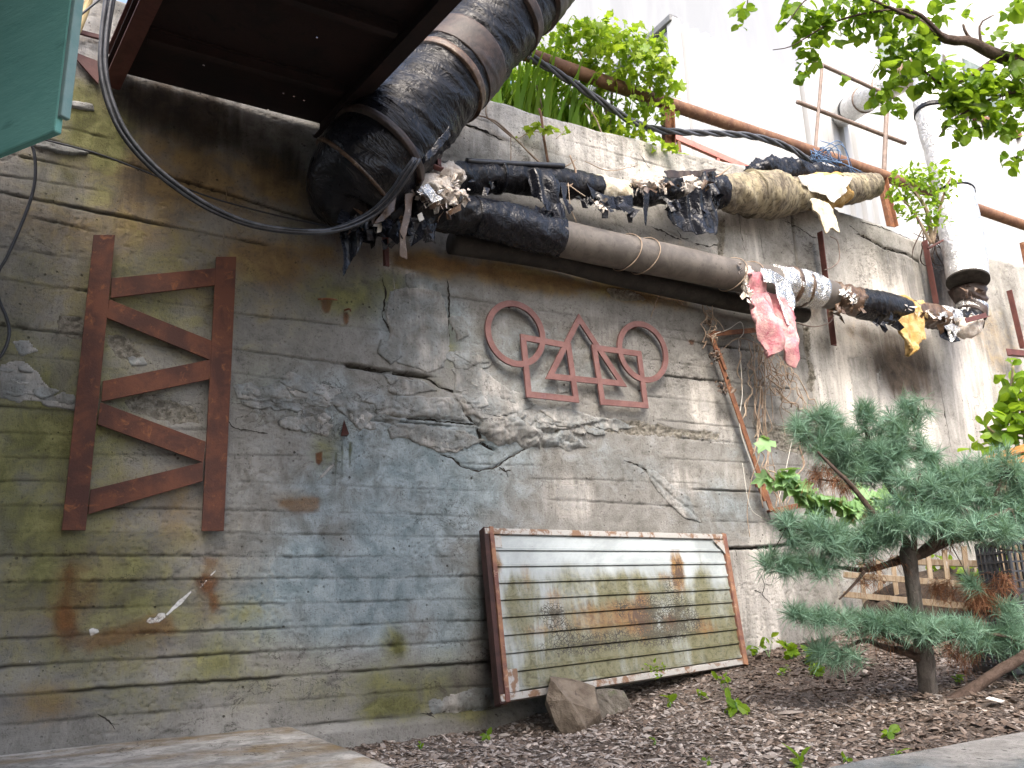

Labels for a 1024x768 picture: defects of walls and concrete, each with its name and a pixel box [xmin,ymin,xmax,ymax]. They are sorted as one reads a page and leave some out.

crack [382,280,390,333]
crack [445,277,453,338]
flaking render [0,340,76,411]
flaking render [233,272,719,453]
water stain [147,591,191,623]